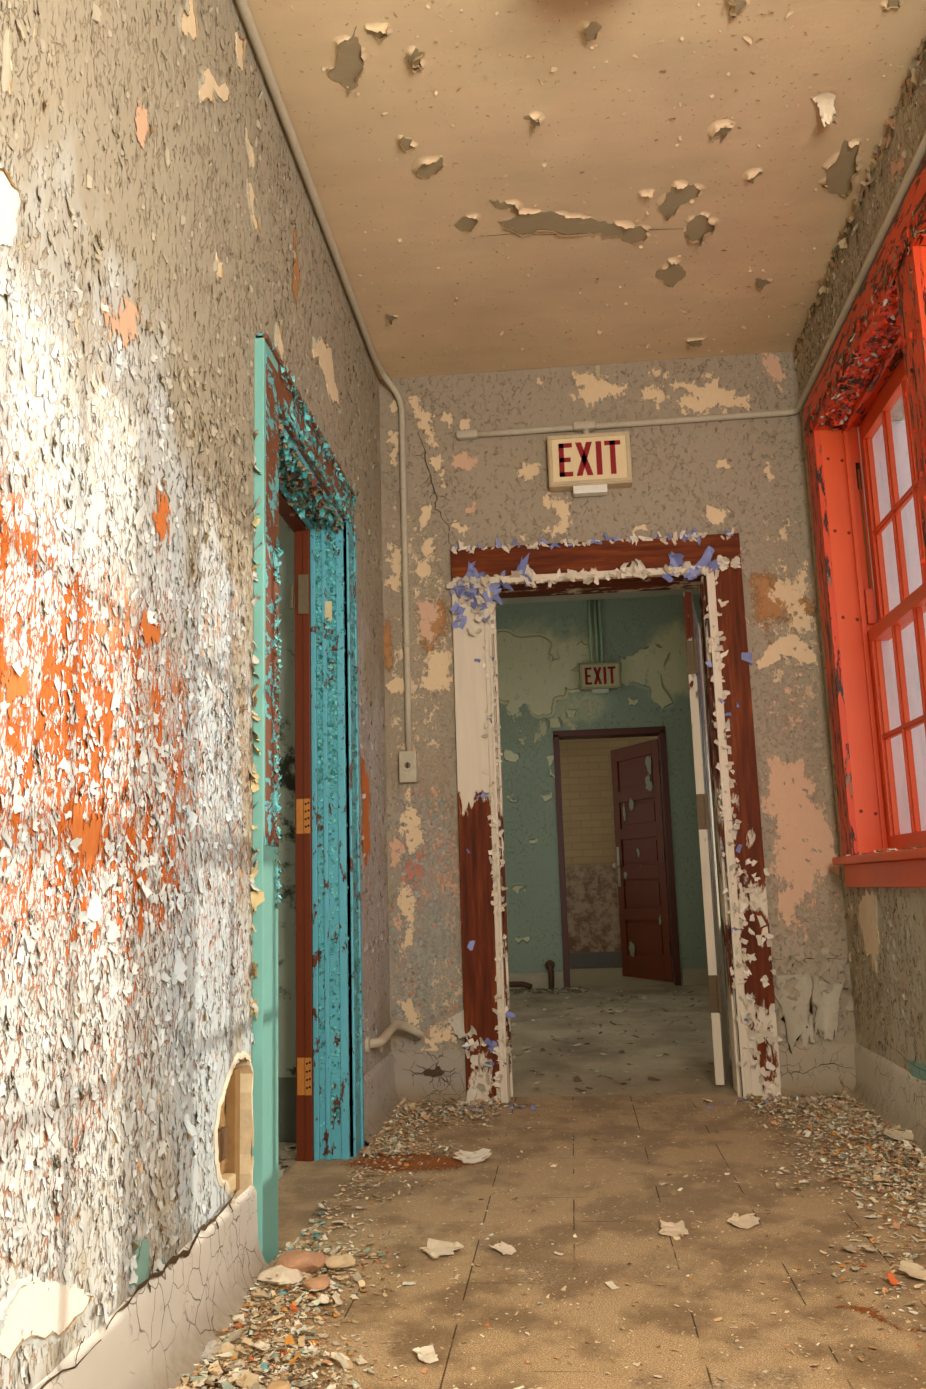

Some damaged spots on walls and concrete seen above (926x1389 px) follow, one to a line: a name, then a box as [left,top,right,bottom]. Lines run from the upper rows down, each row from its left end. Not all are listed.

peeling [322,0,613,115]
peeling [712,458,731,470]
peeling [414,491,926,1098]
crack [40,1181,237,1389]